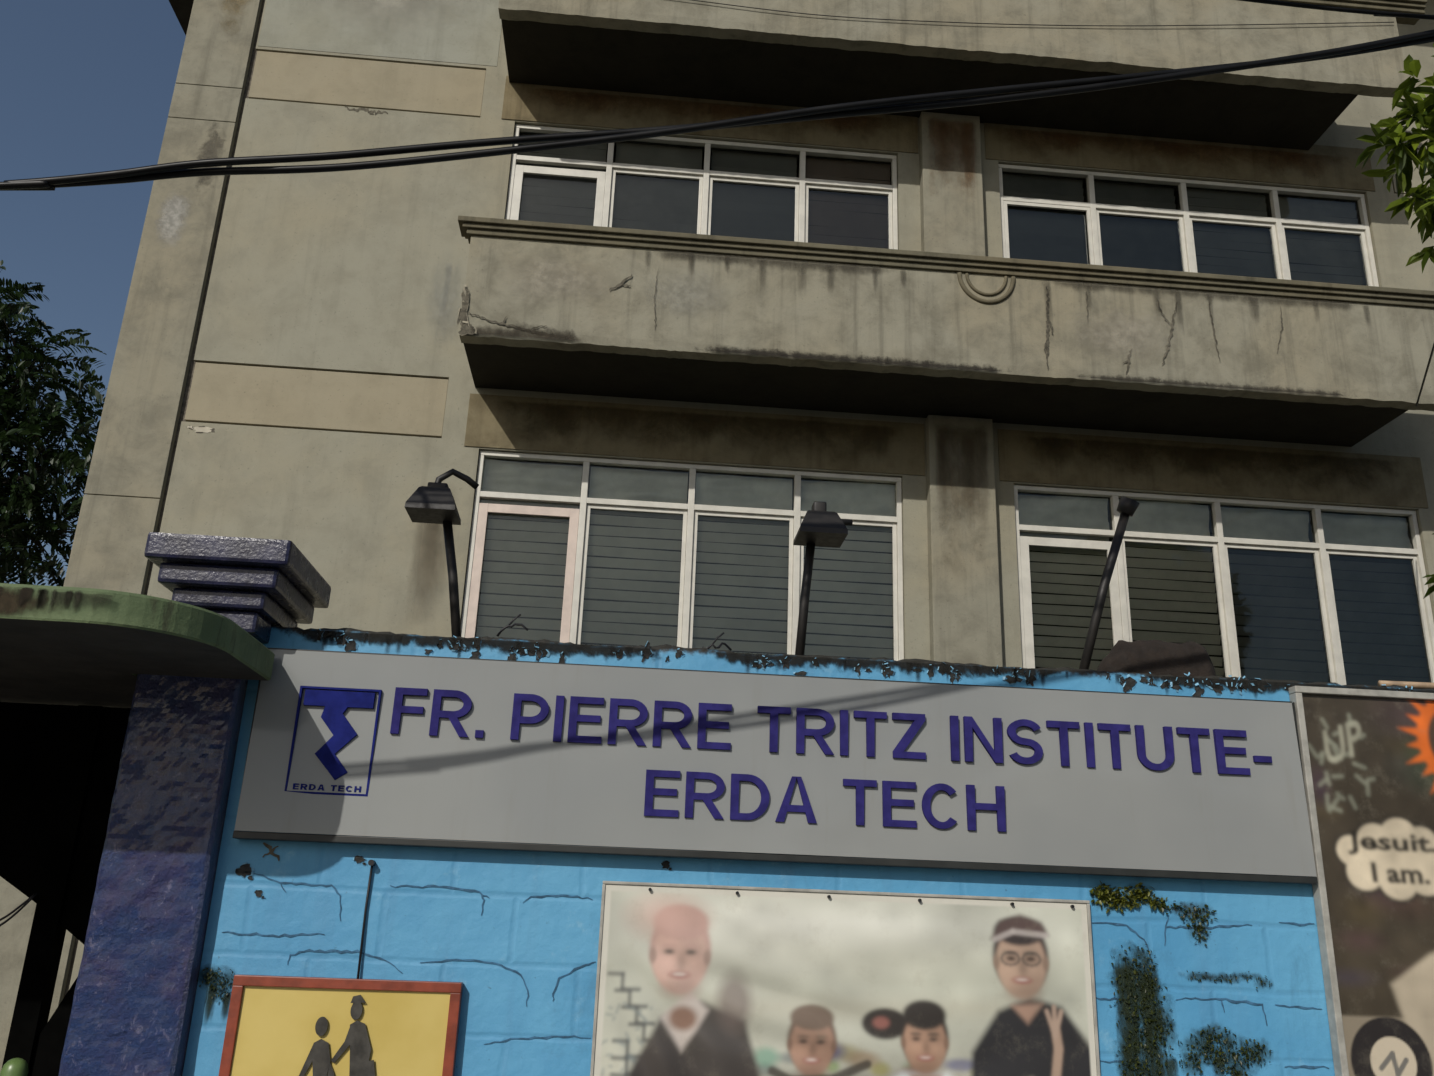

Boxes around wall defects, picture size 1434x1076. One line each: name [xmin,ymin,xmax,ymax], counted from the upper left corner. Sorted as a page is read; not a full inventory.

leakage [476,326,578,340]
crack [1044,287,1054,369]
crack [1123,299,1220,374]
leakage [708,347,1001,371]
leakage [0,586,112,615]
peeling [317,628,358,652]
peeling [425,635,482,659]
peeling [506,644,566,663]
crack [222,842,596,1045]